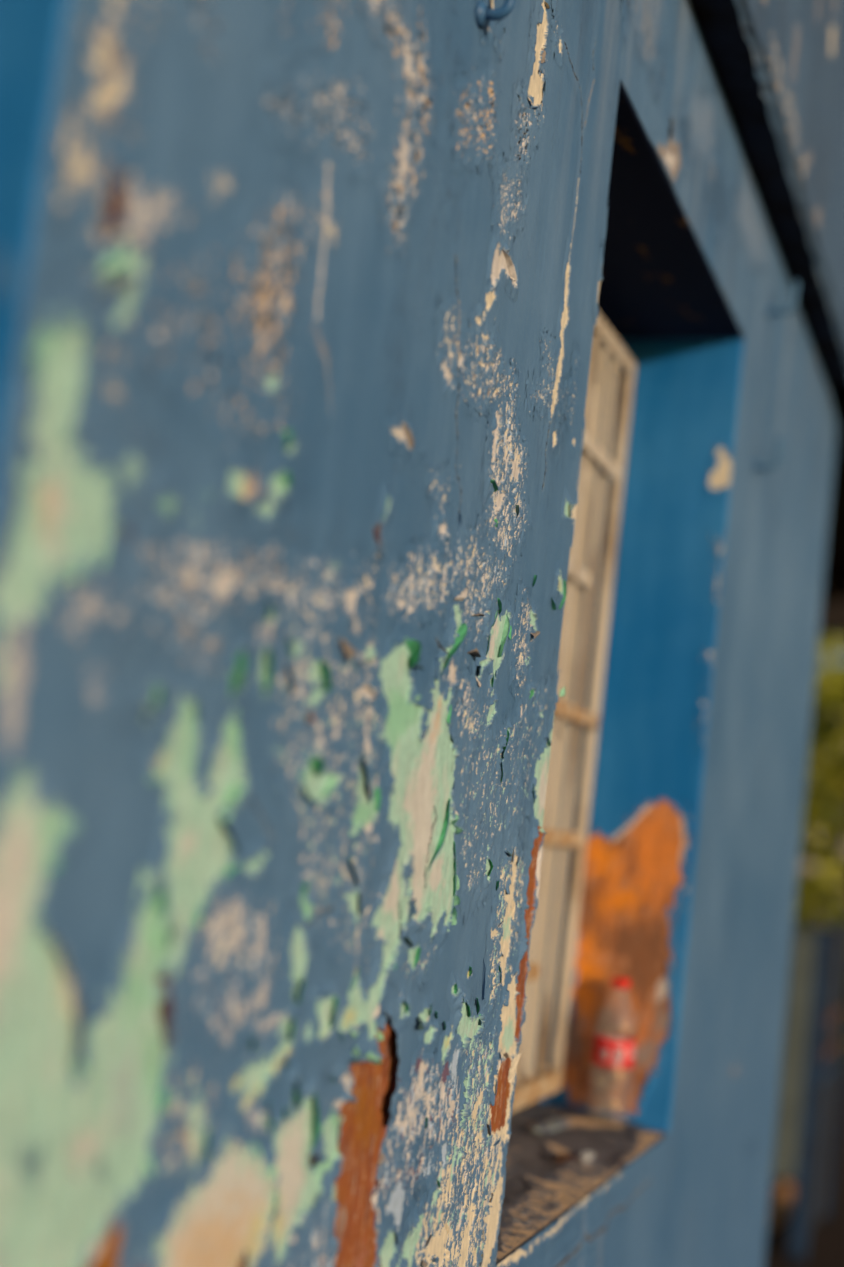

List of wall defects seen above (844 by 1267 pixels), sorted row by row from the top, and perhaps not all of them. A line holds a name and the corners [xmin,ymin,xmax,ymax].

spalling [652,101,683,189]
peeling [0,0,667,1267]
spalling [558,794,691,1121]